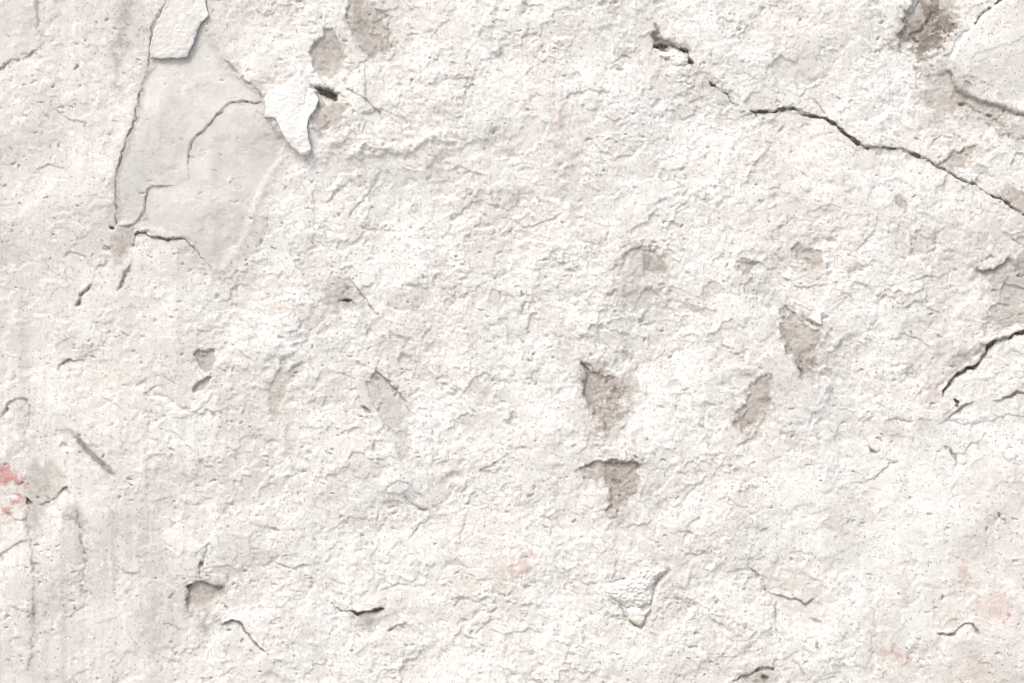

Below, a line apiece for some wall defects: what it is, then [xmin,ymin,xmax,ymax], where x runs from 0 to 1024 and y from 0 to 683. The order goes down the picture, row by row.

flaking render [898,0,958,62]
flaking render [110,0,346,270]
crack [709,81,1024,216]
flaking render [579,362,636,431]
flaking render [734,378,771,428]
flaking render [780,306,822,374]
crack [942,330,1024,412]
flaking render [585,458,644,514]
spalling [185,582,225,612]
crack [340,602,385,616]